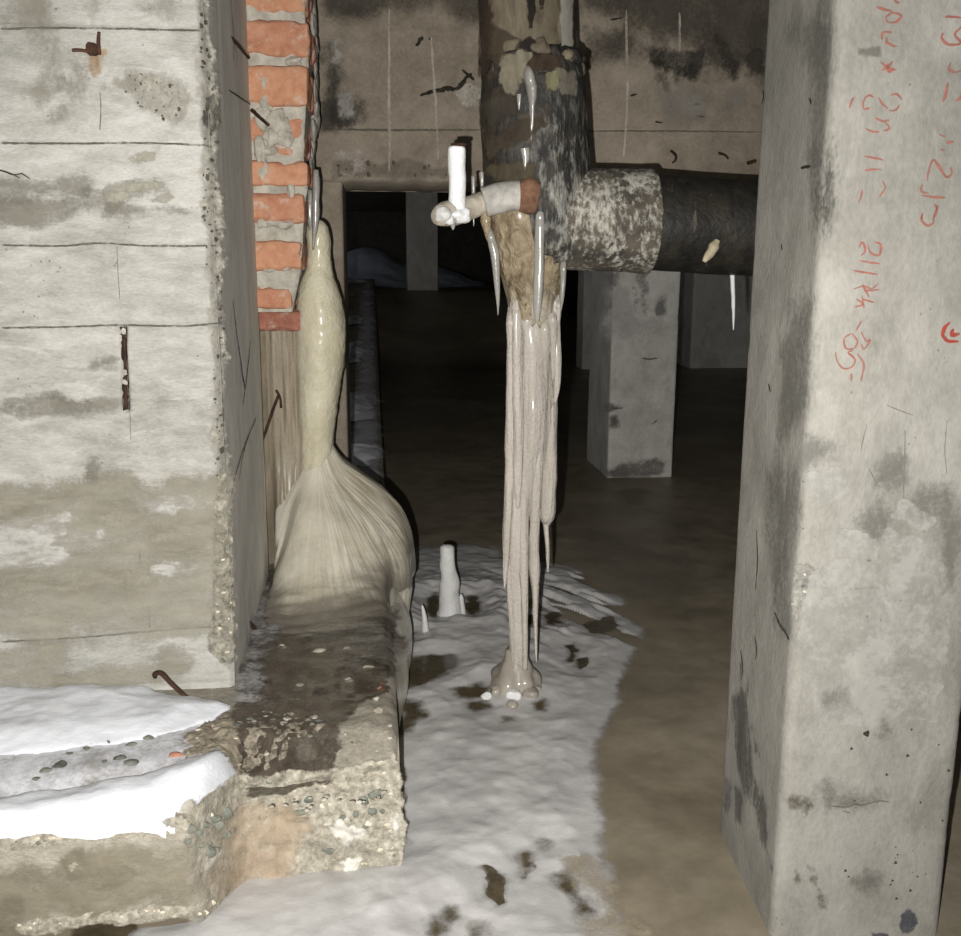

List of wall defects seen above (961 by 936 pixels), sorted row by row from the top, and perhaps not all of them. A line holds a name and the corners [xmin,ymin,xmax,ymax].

crack [420,69,474,96]
damp [0,178,137,227]
corrosion [120,326,129,411]
spalling [0,834,78,853]
spalling [13,753,408,936]